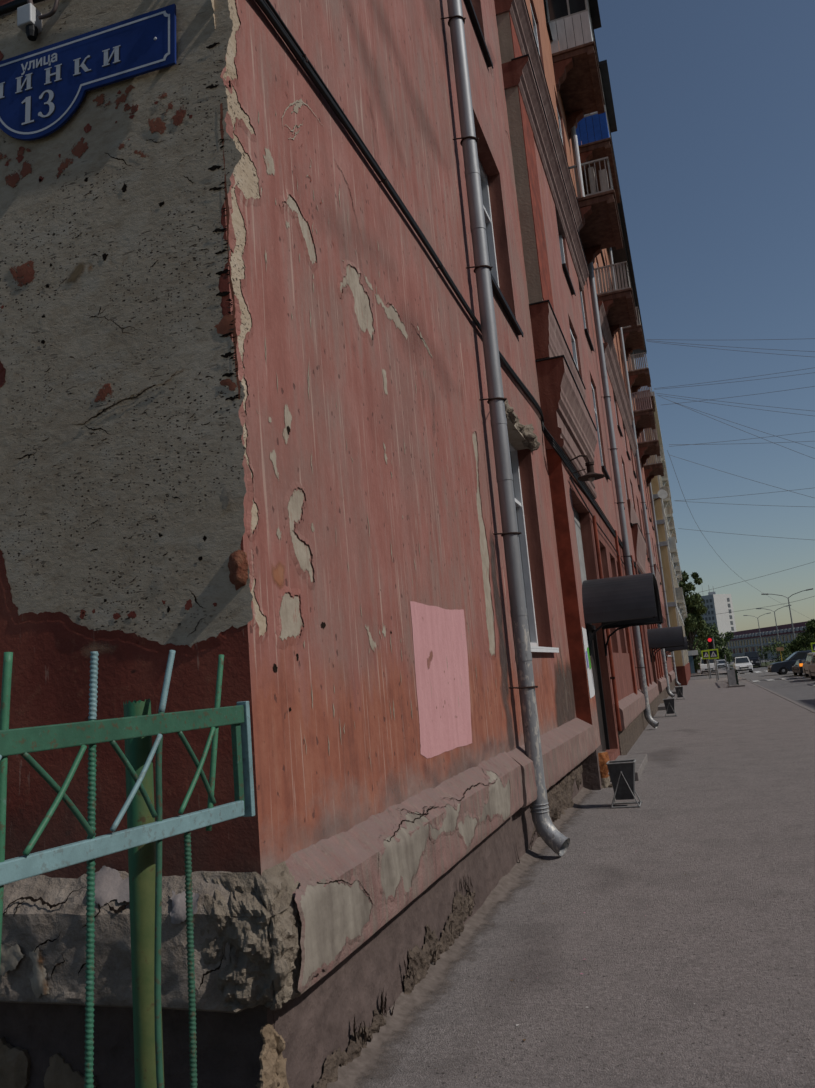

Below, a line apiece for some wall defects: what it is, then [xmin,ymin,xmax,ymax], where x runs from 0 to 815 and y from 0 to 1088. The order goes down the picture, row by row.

peeling [0,0,319,660]
peeling [337,259,432,357]
crack [71,367,183,435]
crack [387,779,497,842]
peeling [94,866,129,907]
spalling [170,768,511,1013]
crack [3,887,130,979]
spalling [0,943,50,998]
spalling [314,874,475,1088]
spalling [0,1037,31,1088]
spalling [43,1052,99,1088]
spalling [255,1023,289,1088]